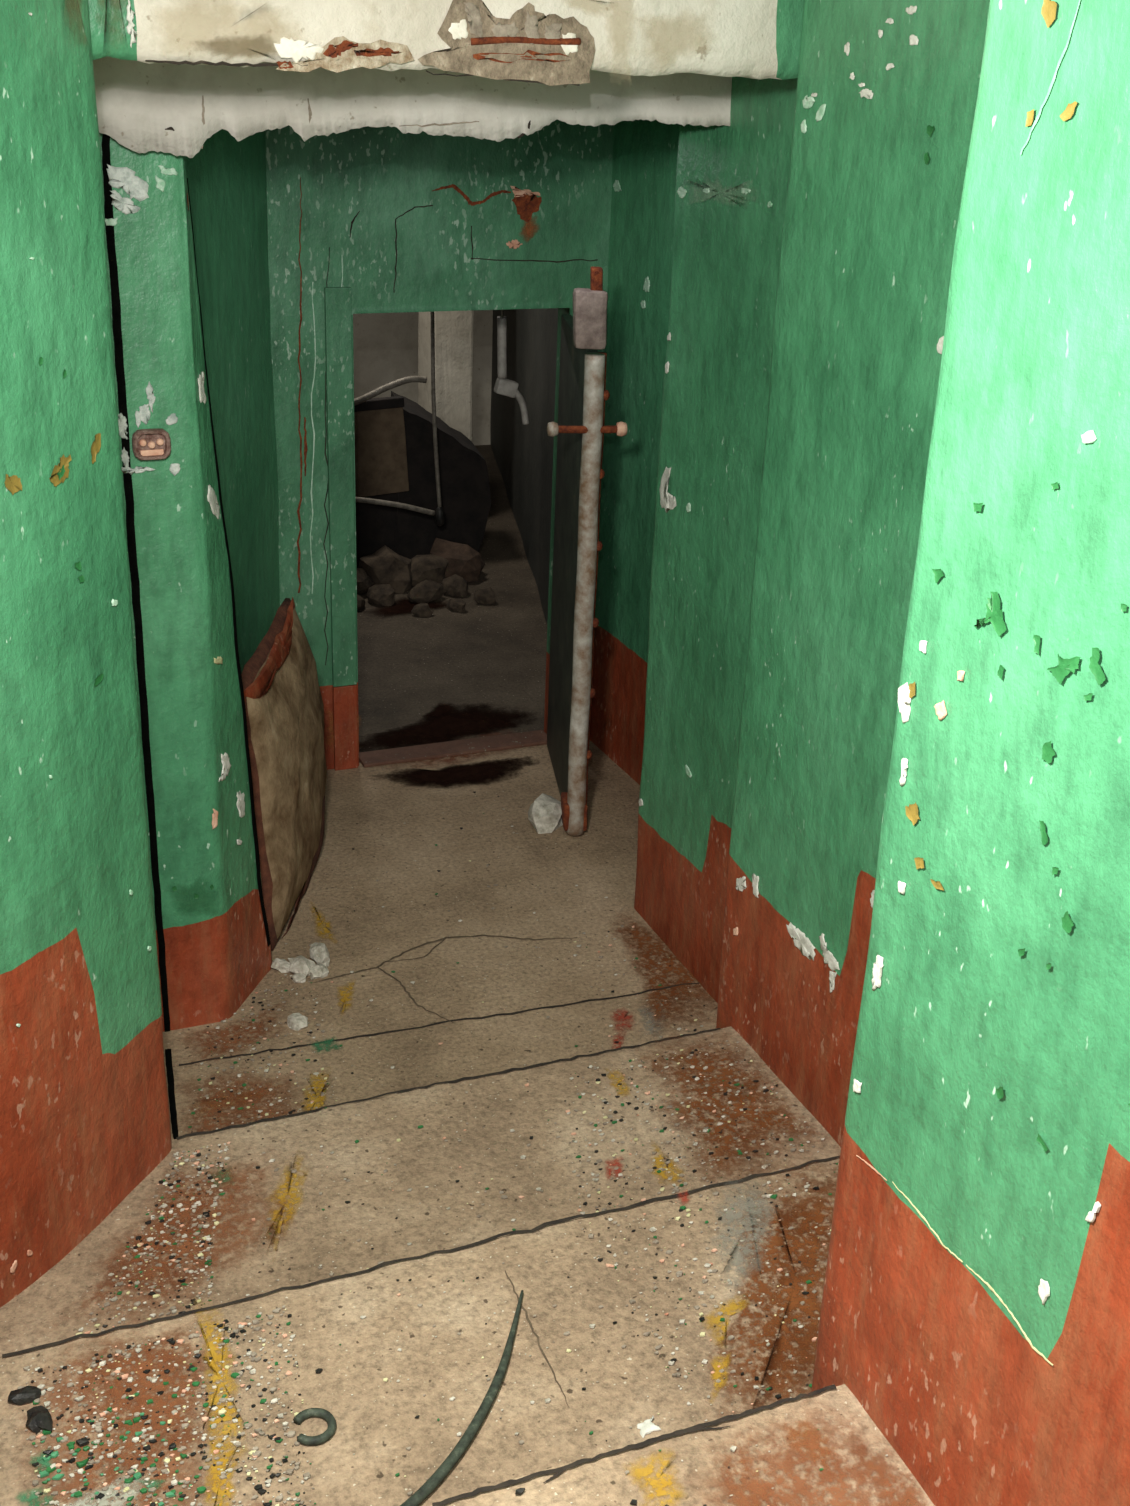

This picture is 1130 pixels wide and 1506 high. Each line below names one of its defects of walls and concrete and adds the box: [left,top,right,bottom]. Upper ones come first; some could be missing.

spalling [273,0,595,86]
peeling [844,42,873,99]
peeling [801,93,826,134]
corrosion [506,186,542,249]
flaking render [118,381,181,476]
crack [101,60,721,1140]
peeling [1033,635,1106,701]
flaking render [898,682,915,724]
flaking render [219,752,245,818]
peeling [736,873,759,898]
peeling [786,922,840,993]
flaking render [871,955,883,991]